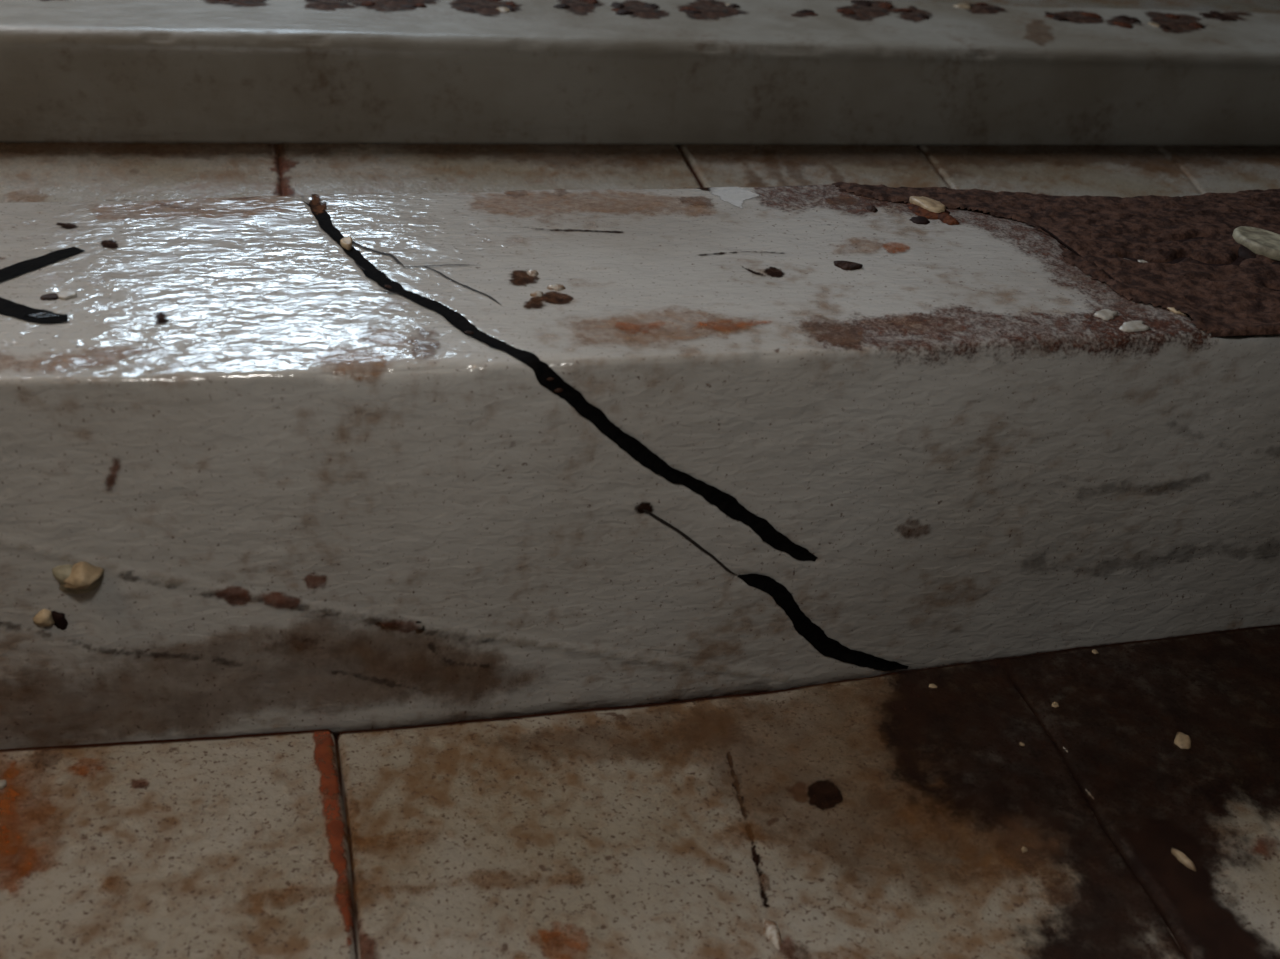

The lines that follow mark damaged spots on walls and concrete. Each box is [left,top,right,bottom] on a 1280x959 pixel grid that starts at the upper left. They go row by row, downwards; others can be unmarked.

crack [302,194,909,671]
spalling [810,182,1280,363]
corrosion [313,731,376,959]
damp [879,625,1280,959]